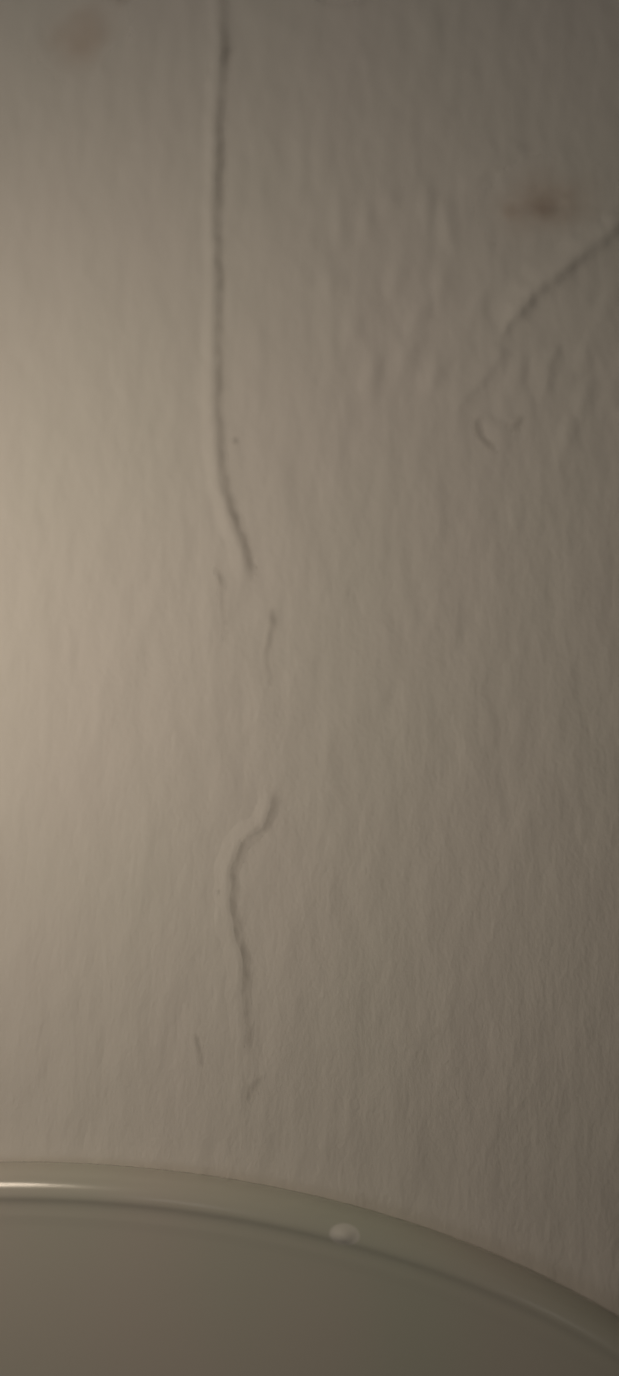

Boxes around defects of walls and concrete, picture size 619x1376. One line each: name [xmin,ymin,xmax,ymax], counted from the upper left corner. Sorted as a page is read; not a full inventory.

crack [199,0,256,584]
crack [213,786,279,1054]